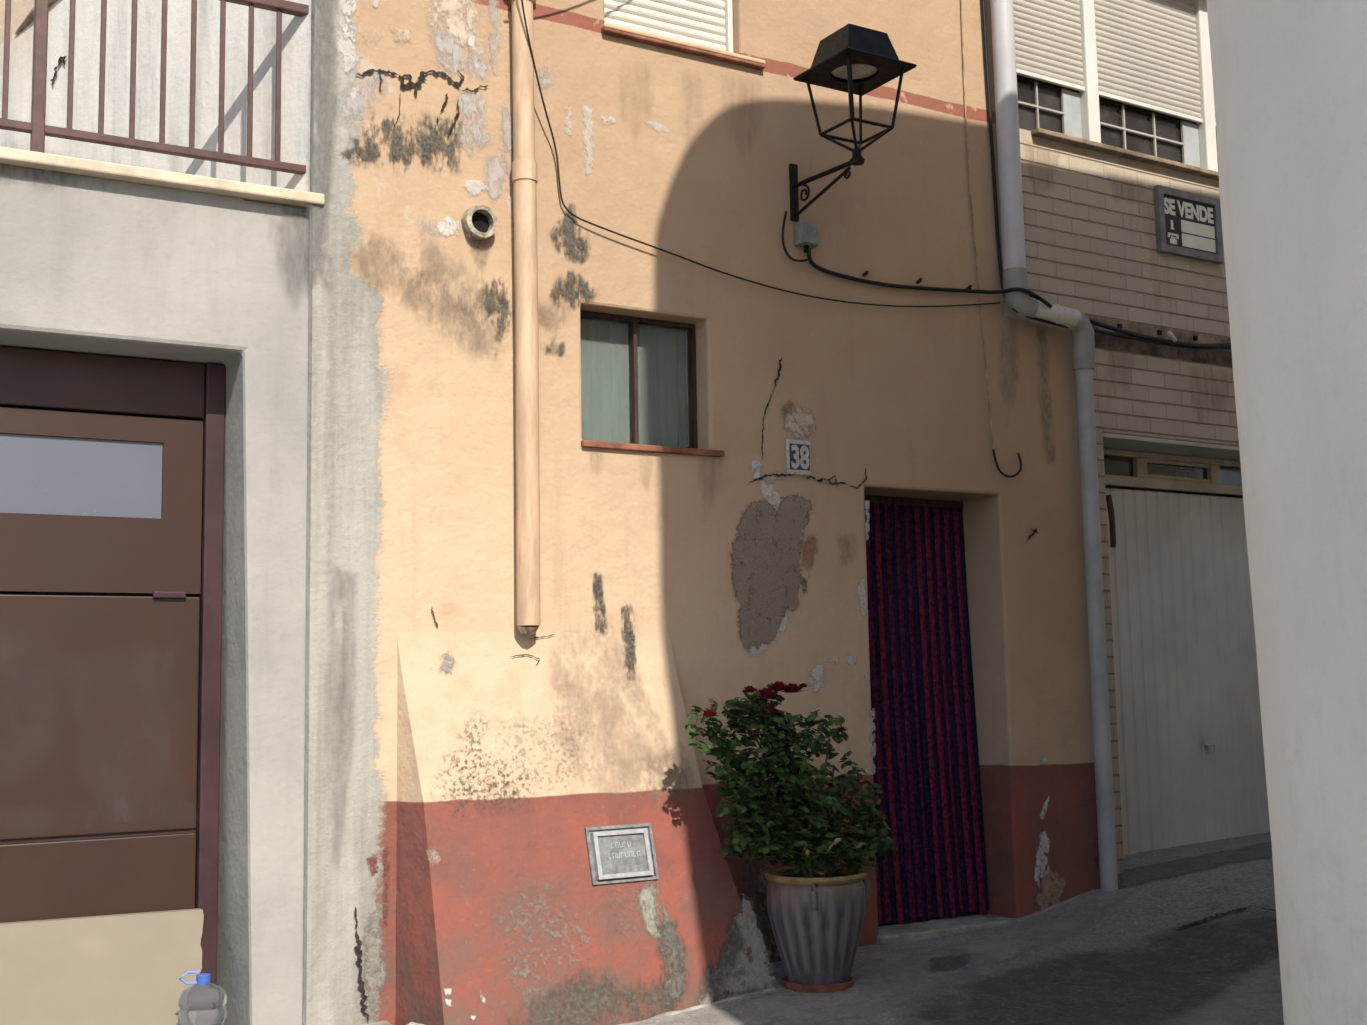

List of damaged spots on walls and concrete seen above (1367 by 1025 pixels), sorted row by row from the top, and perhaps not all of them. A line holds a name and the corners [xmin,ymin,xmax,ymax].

peeling [336,0,384,121]
damp [287,0,462,285]
crack [356,69,488,136]
peeling [428,0,500,78]
peeling [459,93,514,211]
damp [407,280,510,348]
damp [539,205,594,325]
crack [749,357,867,489]
spalling [731,460,812,657]
damp [593,573,636,678]
damp [441,725,522,815]
spalling [506,860,781,1025]